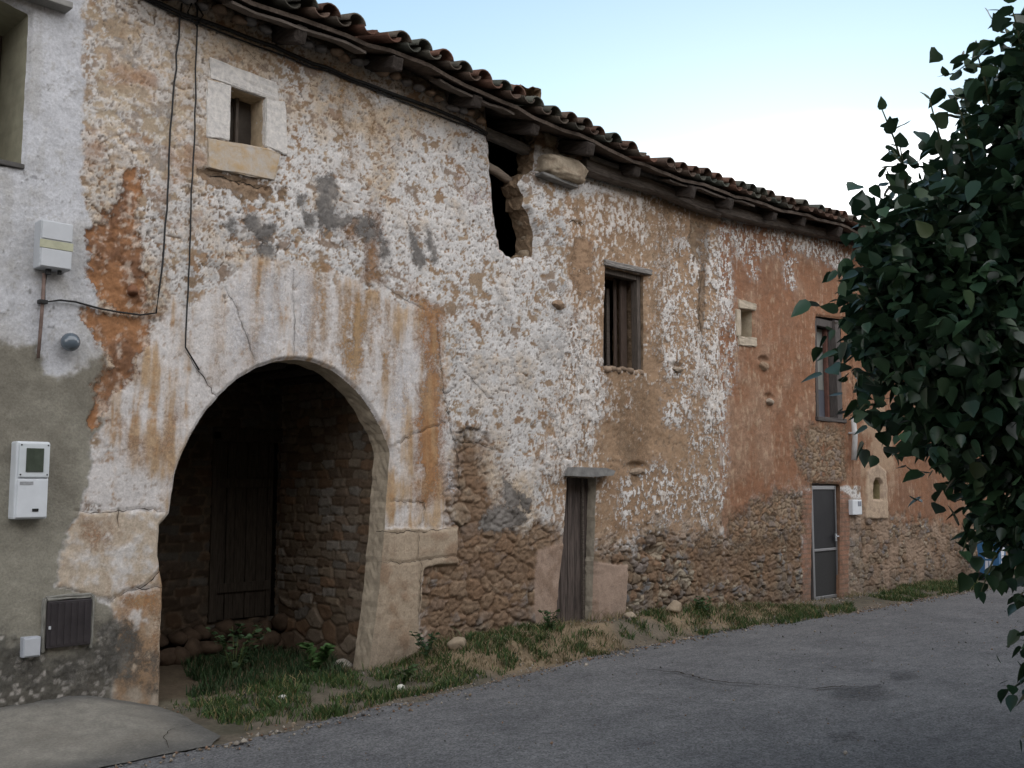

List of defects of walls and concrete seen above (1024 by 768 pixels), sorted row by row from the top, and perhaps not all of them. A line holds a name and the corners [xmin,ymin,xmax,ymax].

crack [205,173,263,189]
damp [226,214,279,256]
damp [297,173,390,262]
flaking render [79,167,151,429]
flaking render [617,222,851,557]